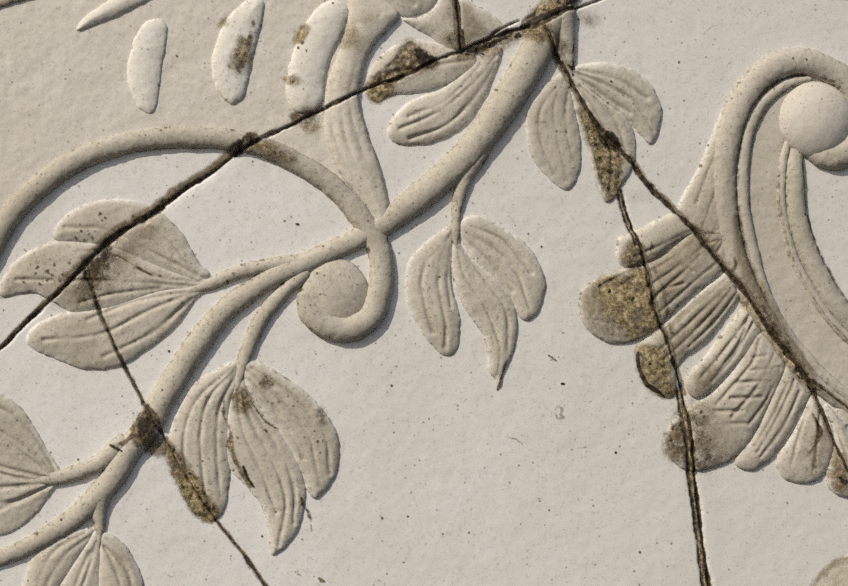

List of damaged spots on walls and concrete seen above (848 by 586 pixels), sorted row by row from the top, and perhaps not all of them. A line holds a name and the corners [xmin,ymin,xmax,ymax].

crack [84,271,268,586]
crack [0,0,601,349]
crack [617,189,711,586]
crack [542,24,848,479]